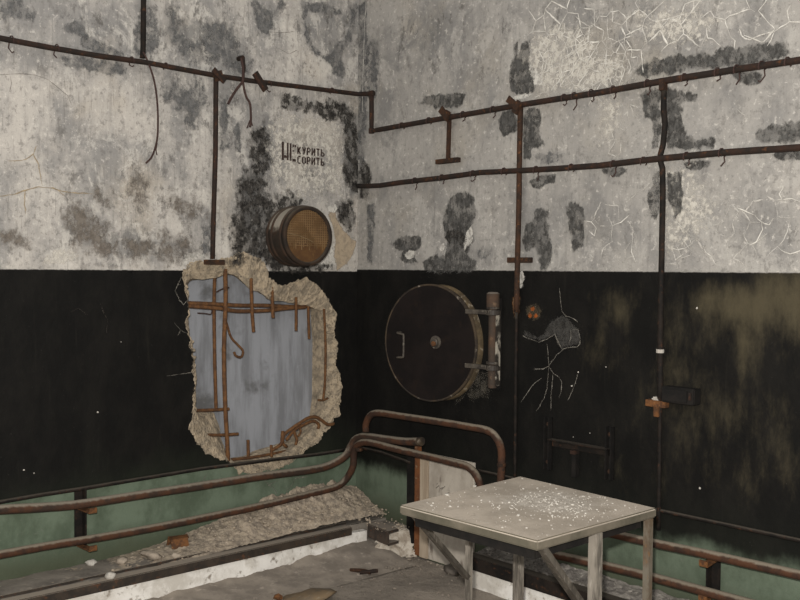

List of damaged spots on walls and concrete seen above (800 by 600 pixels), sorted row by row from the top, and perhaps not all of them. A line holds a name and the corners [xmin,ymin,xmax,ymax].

crack [529,0,800,157]
leakage [637,42,789,85]
leakage [219,97,270,165]
leakage [642,88,715,151]
leakage [647,161,709,219]
leakage [393,192,489,274]
leakage [522,208,552,270]
crack [670,187,800,267]
spalling [182,251,343,475]